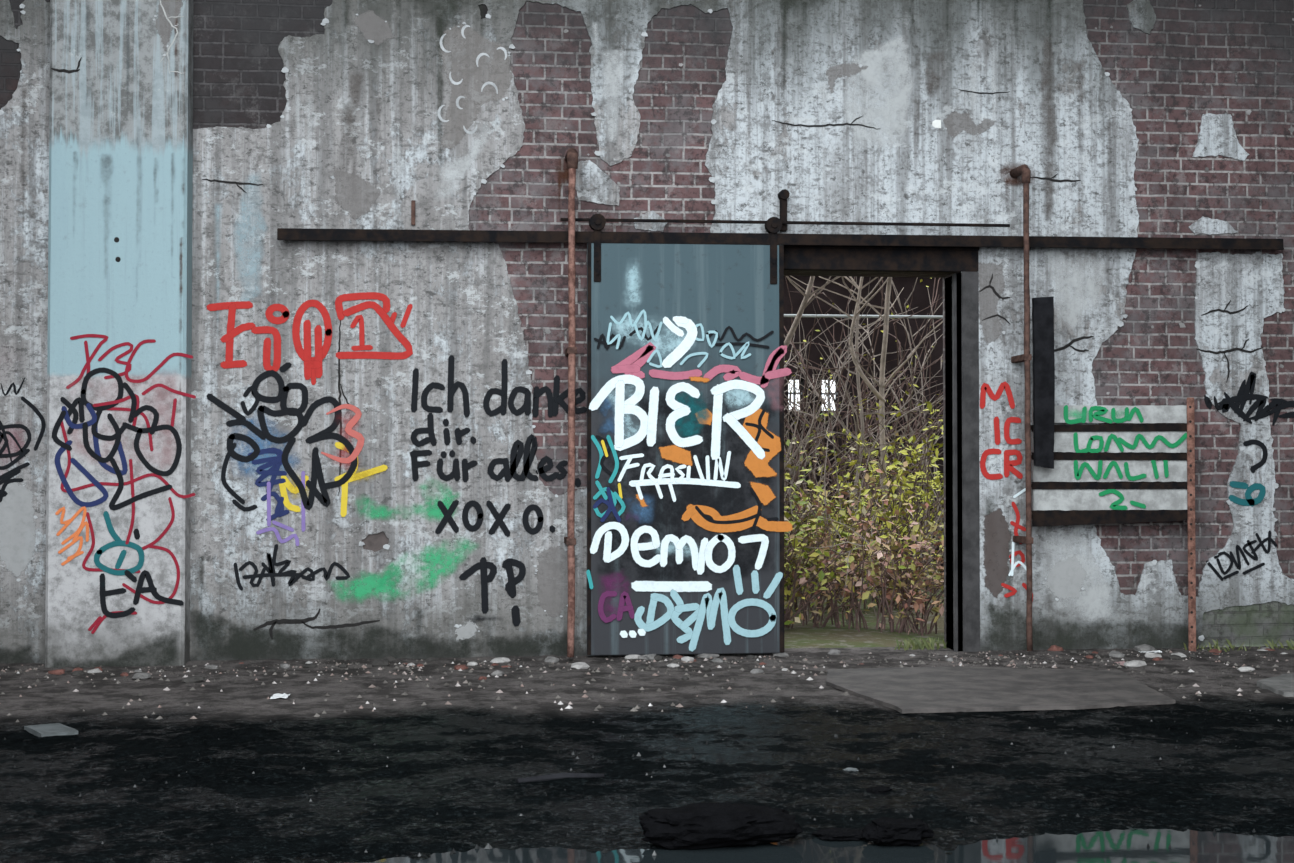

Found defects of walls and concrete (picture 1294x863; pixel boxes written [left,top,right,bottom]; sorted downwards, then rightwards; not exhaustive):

spalling [0,0,26,116]
spalling [153,0,332,129]
peeling [438,72,477,134]
spalling [440,5,491,53]
spalling [468,1,733,497]
spalling [1083,0,1294,597]
spalling [1198,601,1294,648]